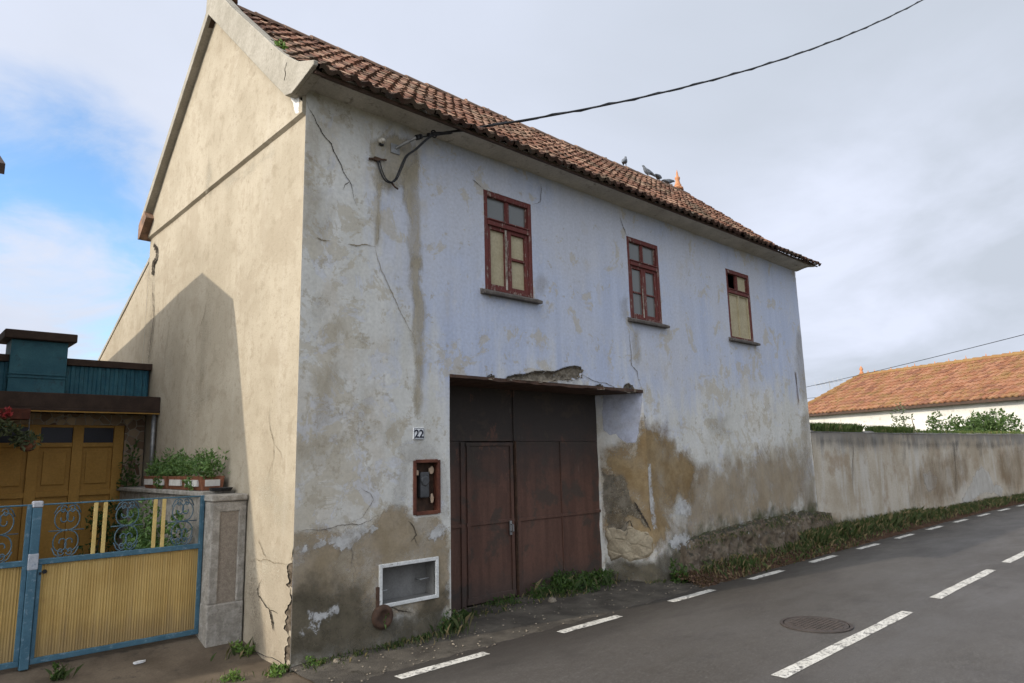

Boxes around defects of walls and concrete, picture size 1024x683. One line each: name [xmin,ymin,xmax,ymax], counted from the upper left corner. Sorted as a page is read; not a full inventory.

crack [307,102,356,203]
crack [318,233,414,337]
damp [371,135,424,412]
spalling [488,365,584,385]
peeling [596,383,642,443]
crack [299,490,374,567]
spalling [602,464,655,535]
damp [601,422,815,582]
damp [244,540,449,665]
peeling [284,505,450,672]